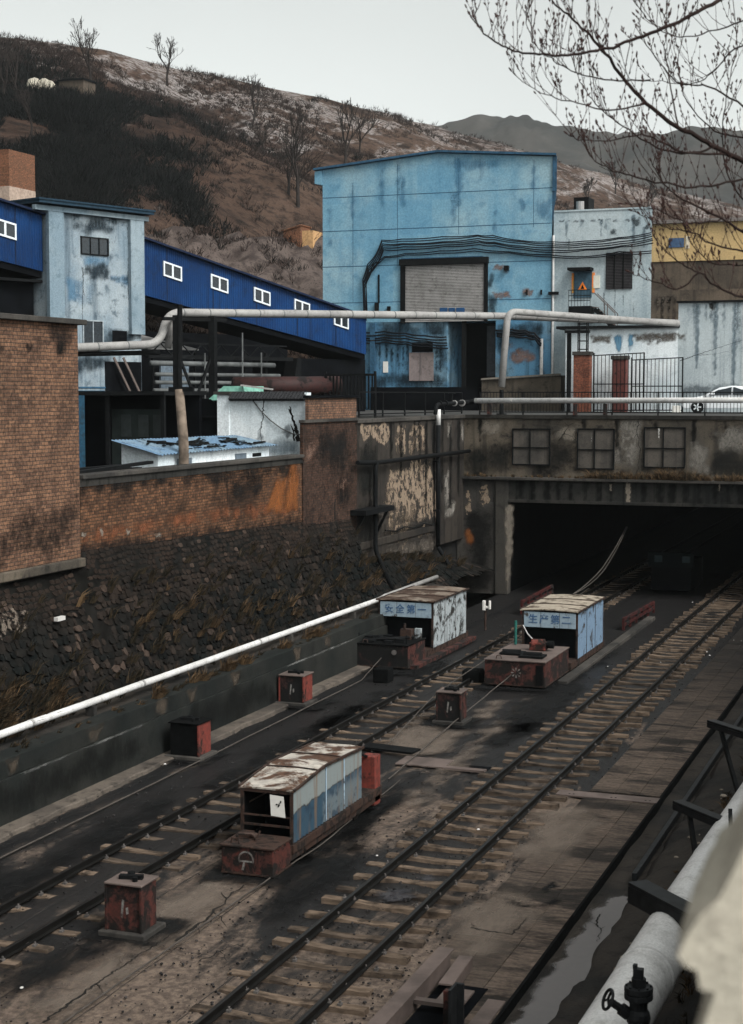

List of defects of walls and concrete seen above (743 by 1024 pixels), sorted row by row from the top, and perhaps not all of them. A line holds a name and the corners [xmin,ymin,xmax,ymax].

leakage [693,302,718,367]
leakage [732,303,740,384]
rust [269,465,298,511]
peeling [360,422,490,549]